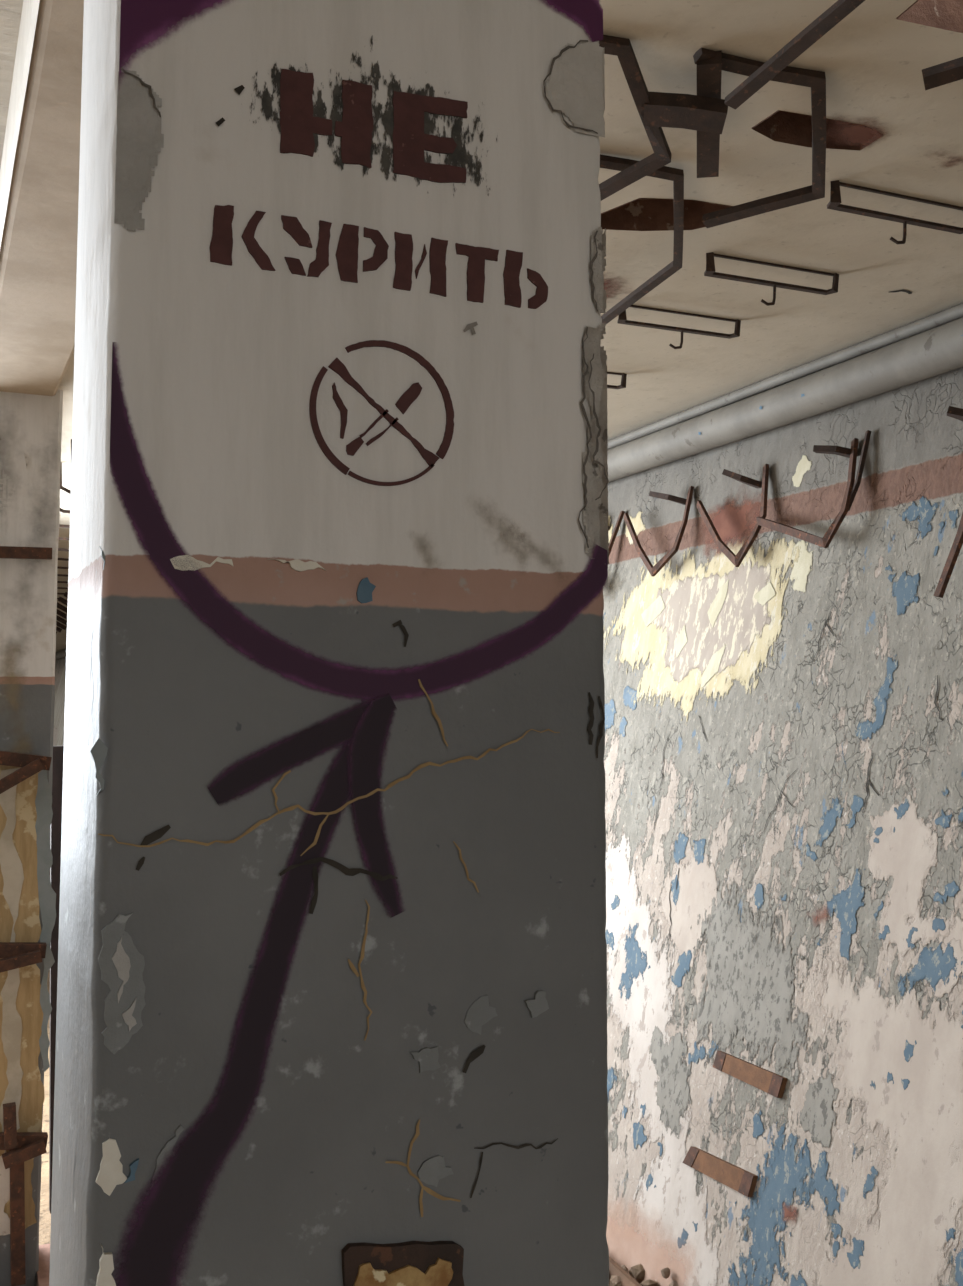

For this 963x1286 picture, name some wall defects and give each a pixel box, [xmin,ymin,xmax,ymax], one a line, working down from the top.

spalling [114,68,164,232]
corrosion [833,120,883,145]
spalling [578,198,732,564]
crack [392,620,409,647]
corrosion [603,573,622,598]
flaking render [603,524,813,737]
crack [98,679,605,1041]
peeling [0,765,56,1132]
crack [463,1045,486,1073]
peeling [605,786,963,1286]
peeling [0,1150,37,1236]
crack [385,1120,558,1217]